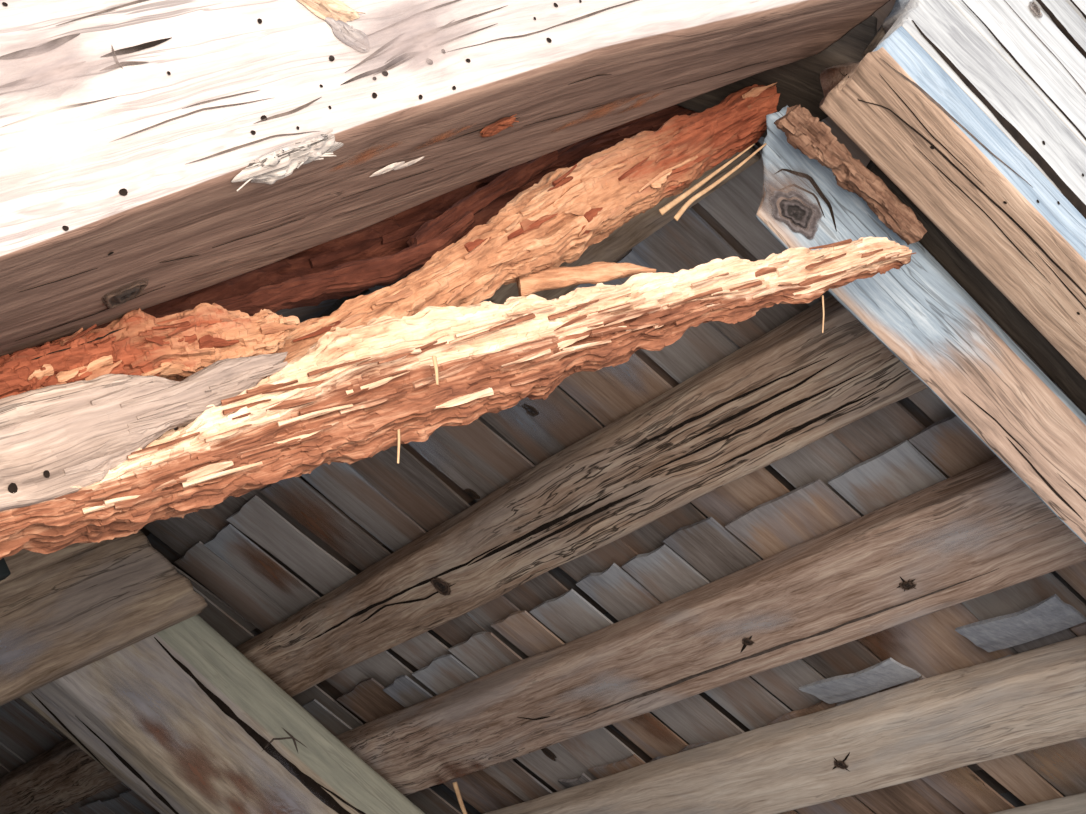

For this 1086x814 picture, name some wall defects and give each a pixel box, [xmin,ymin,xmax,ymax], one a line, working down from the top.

peeling [0,45,101,91]
peeling [742,82,777,99]
spalling [480,114,519,138]
spalling [231,129,344,192]
peeling [370,157,424,177]
peeling [473,168,510,189]
peeling [503,105,692,240]
peeling [28,237,900,514]
crack [300,353,884,647]
crack [154,637,366,814]
corrosion [178,748,250,814]